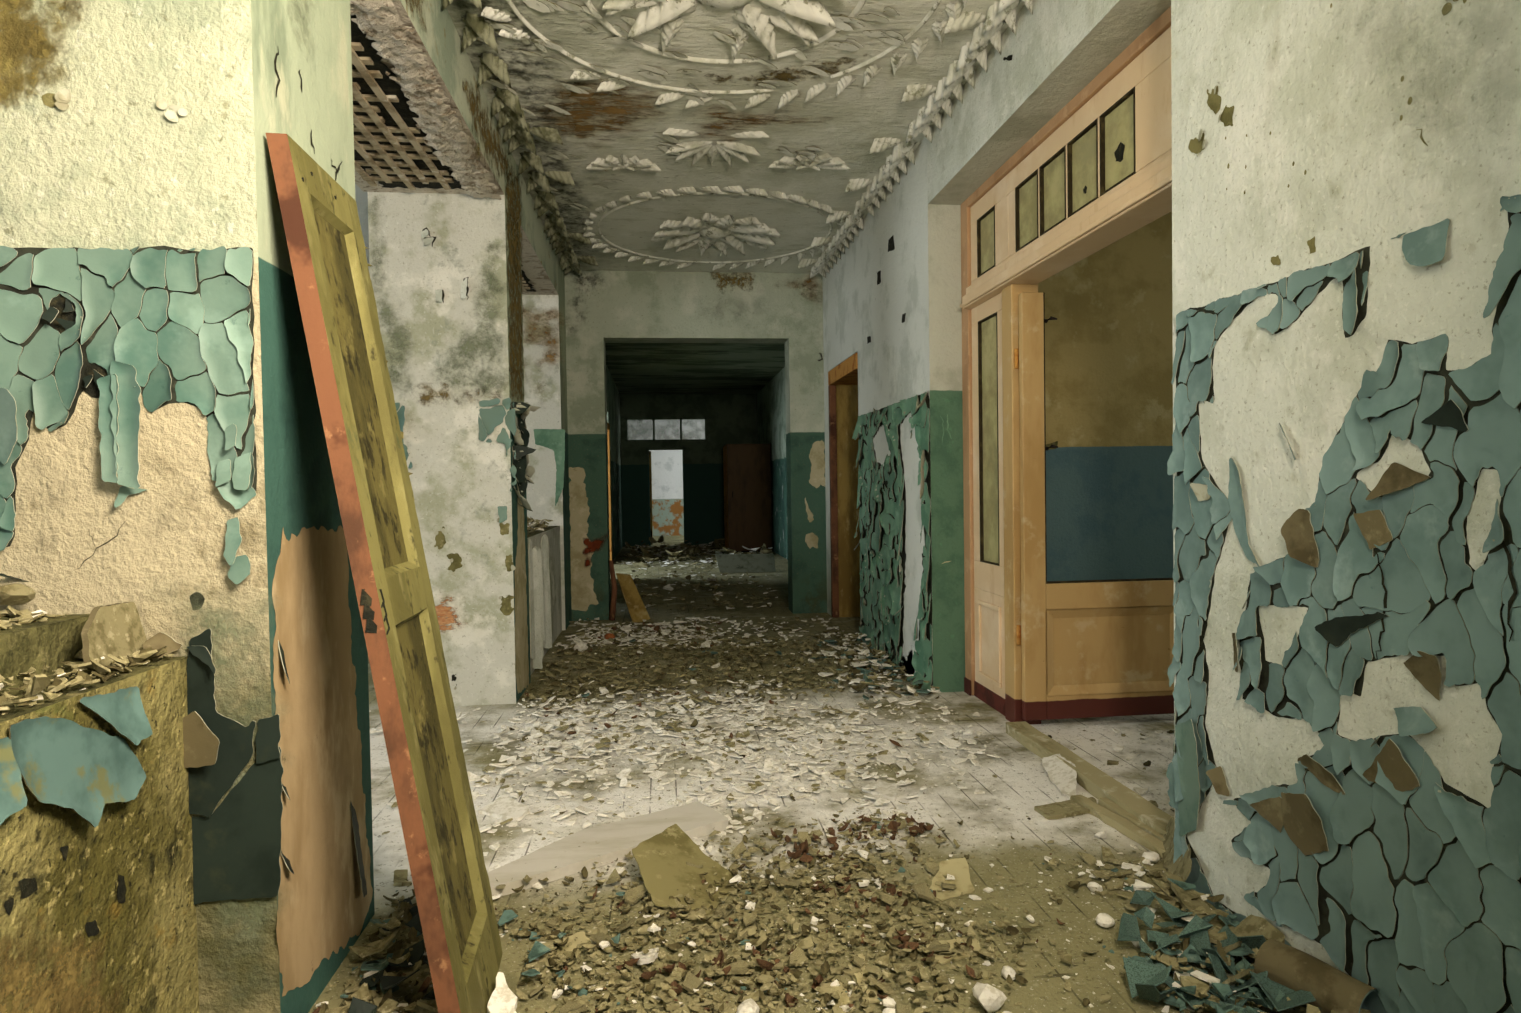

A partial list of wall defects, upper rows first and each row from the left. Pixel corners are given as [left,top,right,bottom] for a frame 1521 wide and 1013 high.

water stain [0,0,81,104]
spalling [350,0,501,200]
spalling [1188,129,1205,157]
spalling [1207,86,1247,140]
peeling [0,246,257,584]
peeling [477,398,599,694]
peeling [805,440,825,548]
peeling [852,391,933,690]
peeling [1166,194,1521,1013]
peeling [0,686,153,827]
peeling [142,525,373,997]
spalling [4,878,38,916]